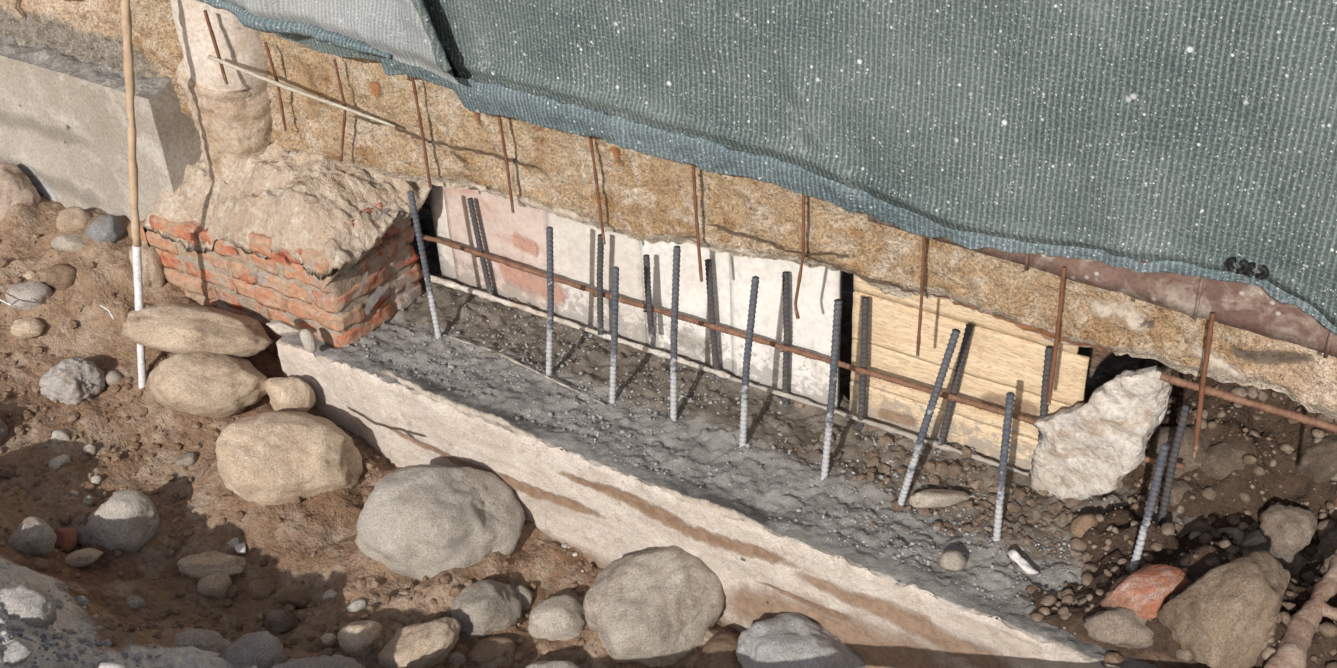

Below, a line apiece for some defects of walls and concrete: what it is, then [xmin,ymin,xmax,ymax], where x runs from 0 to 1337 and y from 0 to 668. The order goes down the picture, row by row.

spalling [1091,299,1147,331]
spalling [1191,346,1243,377]
crack [347,407,426,438]
spalling [1129,373,1337,571]